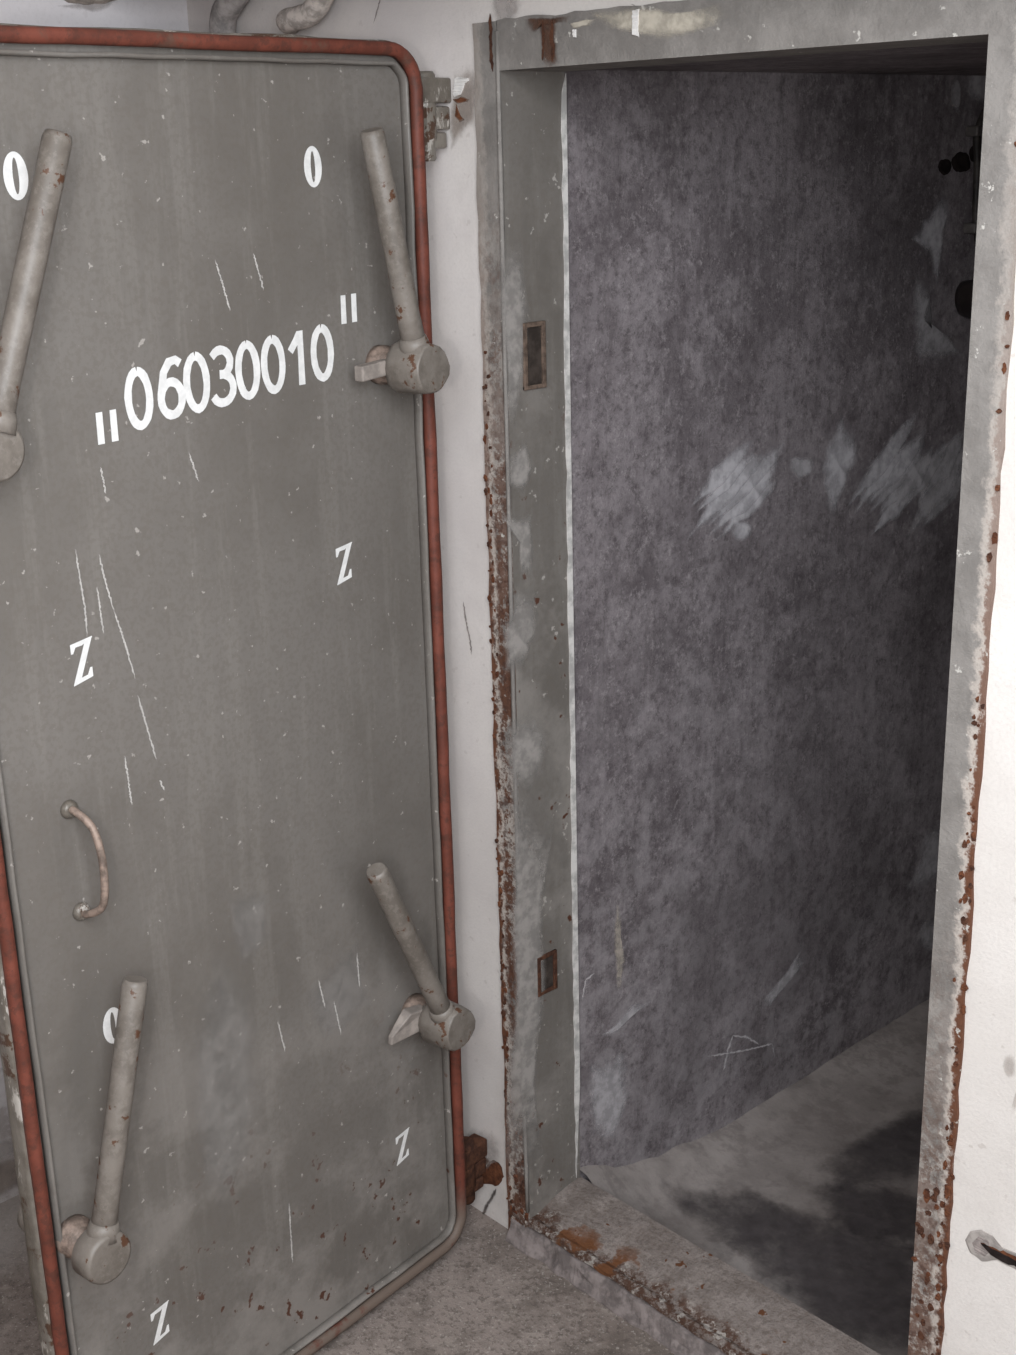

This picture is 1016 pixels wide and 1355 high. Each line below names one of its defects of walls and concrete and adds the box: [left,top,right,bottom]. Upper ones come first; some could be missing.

corrosion [529,17,563,62]
corrosion [986,532,998,562]
corrosion [483,465,499,715]
corrosion [971,696,985,740]
corrosion [962,806,976,848]
corrosion [495,835,505,938]
corrosion [958,865,975,945]
corrosion [500,955,509,1062]
corrosion [953,977,969,1015]
water stain [0,1160,17,1192]
corrosion [482,1121,529,1221]
corrosion [911,1122,955,1355]